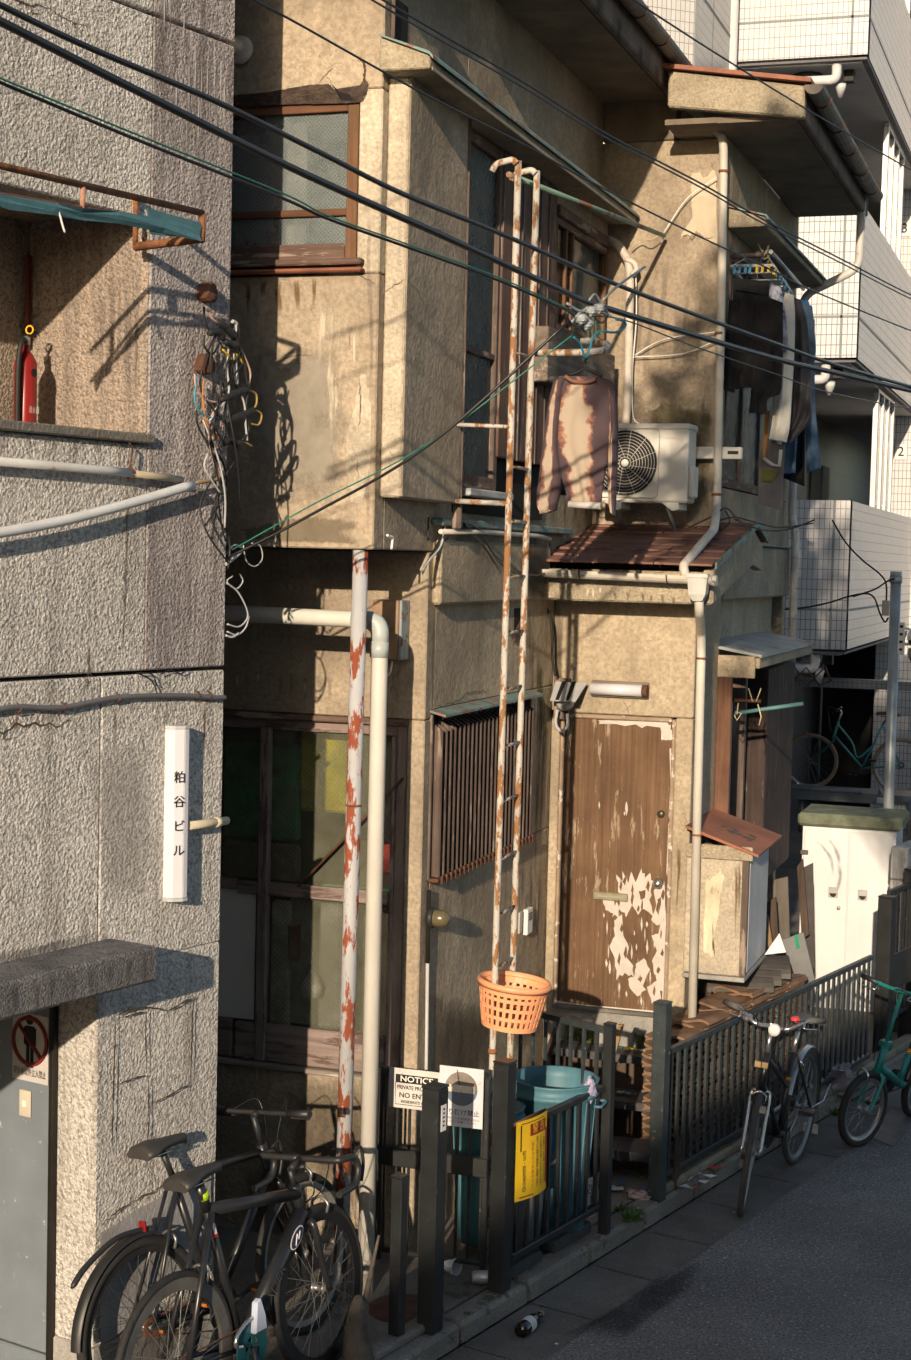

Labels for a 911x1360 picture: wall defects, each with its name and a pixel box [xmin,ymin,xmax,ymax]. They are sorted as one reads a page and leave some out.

crack [17,0,87,37]
water stain [176,60,225,133]
peeling [557,824,669,1012]